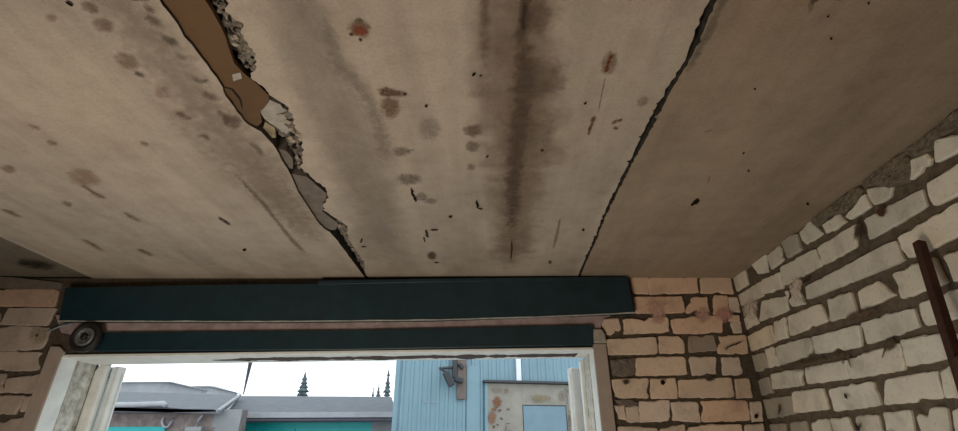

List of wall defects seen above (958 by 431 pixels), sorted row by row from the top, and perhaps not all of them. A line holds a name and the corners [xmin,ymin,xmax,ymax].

spalling [212,0,257,71]
rust [349,19,370,42]
spalling [276,111,306,173]
water stain [467,126,480,151]
water stain [493,0,542,259]